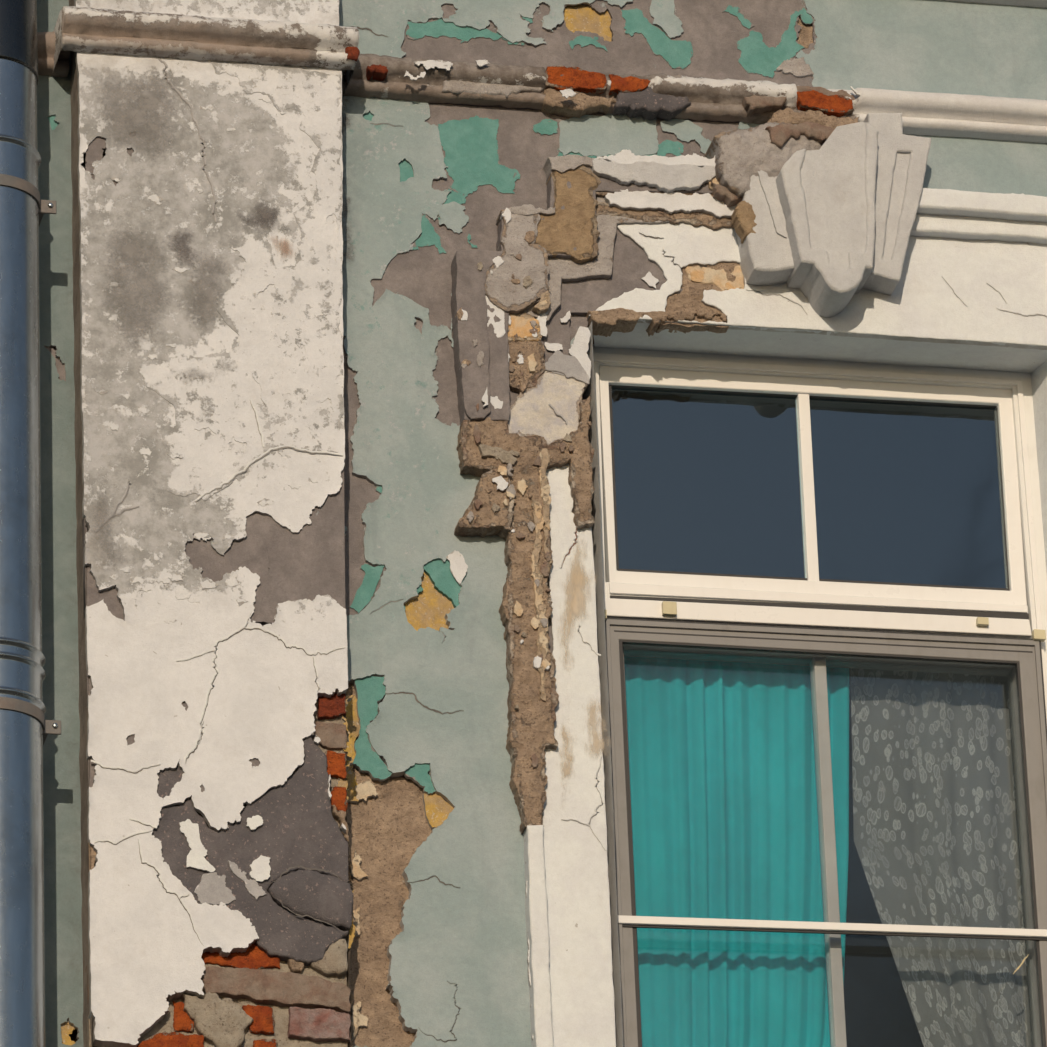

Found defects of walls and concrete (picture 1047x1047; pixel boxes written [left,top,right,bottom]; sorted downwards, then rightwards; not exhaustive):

peeling [559,89,578,99]
peeling [401,0,816,87]
water stain [174,234,220,318]
peeling [82,60,386,625]
crack [195,400,343,502]
peeling [370,103,835,834]
crack [91,613,345,773]
crack [561,756,607,851]
crack [94,818,204,946]
flaking render [137,676,454,1047]
peeling [61,1015,96,1047]
crack [418,980,462,1042]